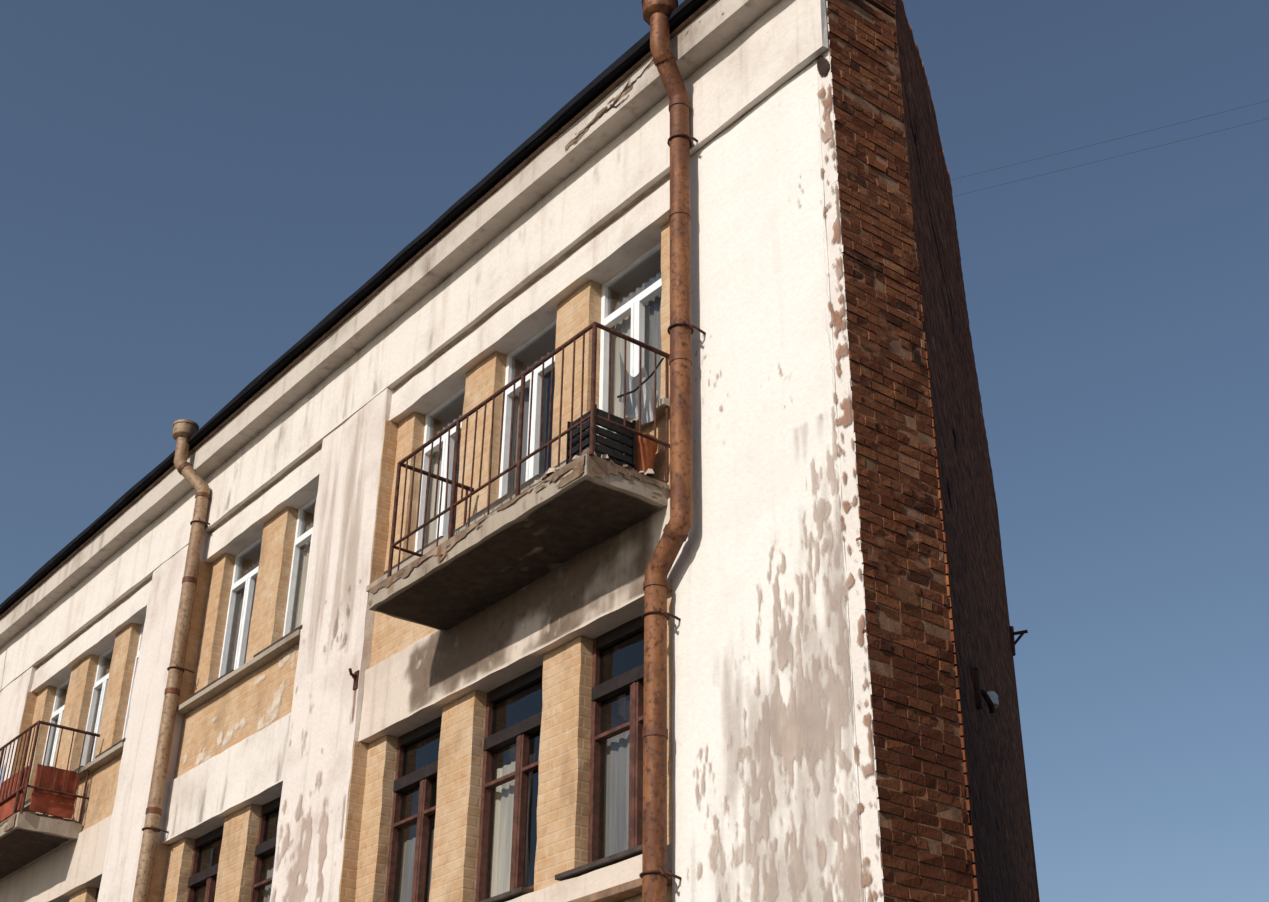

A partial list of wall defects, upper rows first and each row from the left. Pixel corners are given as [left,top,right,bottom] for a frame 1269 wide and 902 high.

spalling [816,55,847,377]
spalling [349,454,584,605]
peeling [323,607,349,651]
peeling [693,392,881,902]
peeling [271,773,345,902]